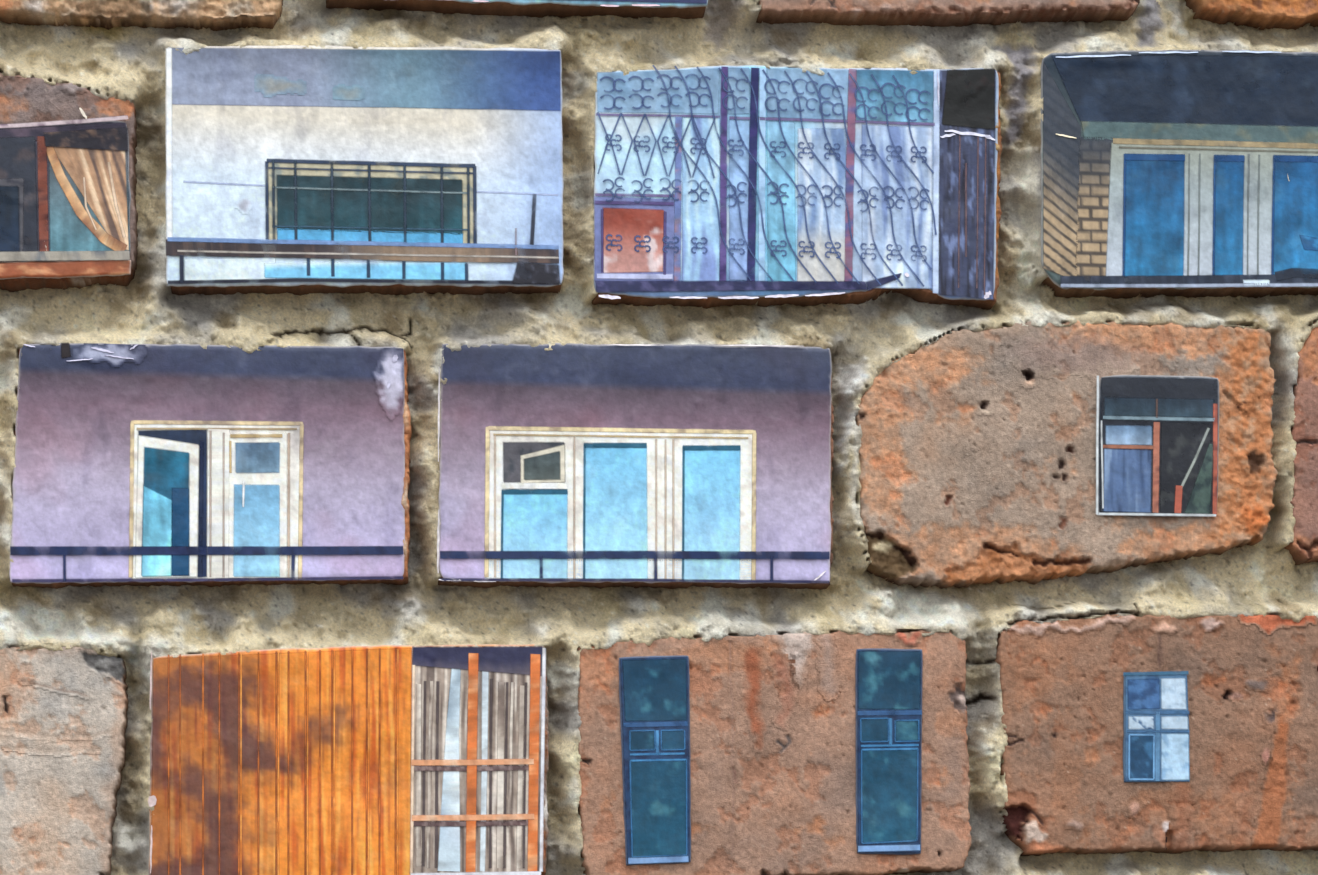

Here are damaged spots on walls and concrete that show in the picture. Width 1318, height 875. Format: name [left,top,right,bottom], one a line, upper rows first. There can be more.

spalling [46,0,176,30]
spalling [197,0,283,31]
spalling [864,526,920,583]
spalling [935,541,1093,588]
spalling [1002,803,1086,855]